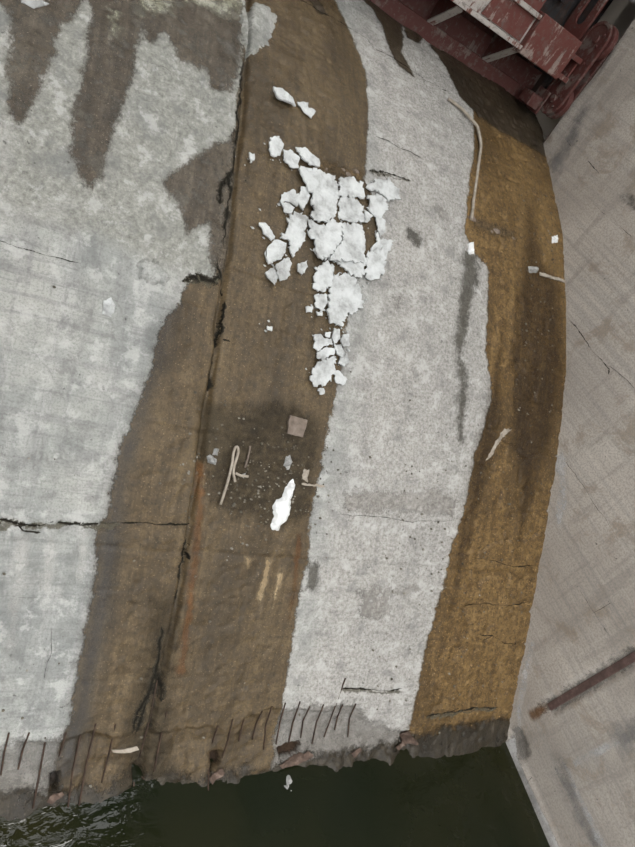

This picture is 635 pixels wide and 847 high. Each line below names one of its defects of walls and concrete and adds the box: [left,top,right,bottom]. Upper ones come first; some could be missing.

water stain [364,0,422,77]
peeling [273,86,316,118]
water stain [430,44,581,167]
crack [182,63,244,391]
peeling [250,136,401,395]
water stain [455,251,479,442]
water stain [0,0,378,821]
crack [0,518,191,599]
spalling [0,732,67,809]
crack [132,627,167,733]
spalling [252,678,401,770]
water stain [298,717,558,847]